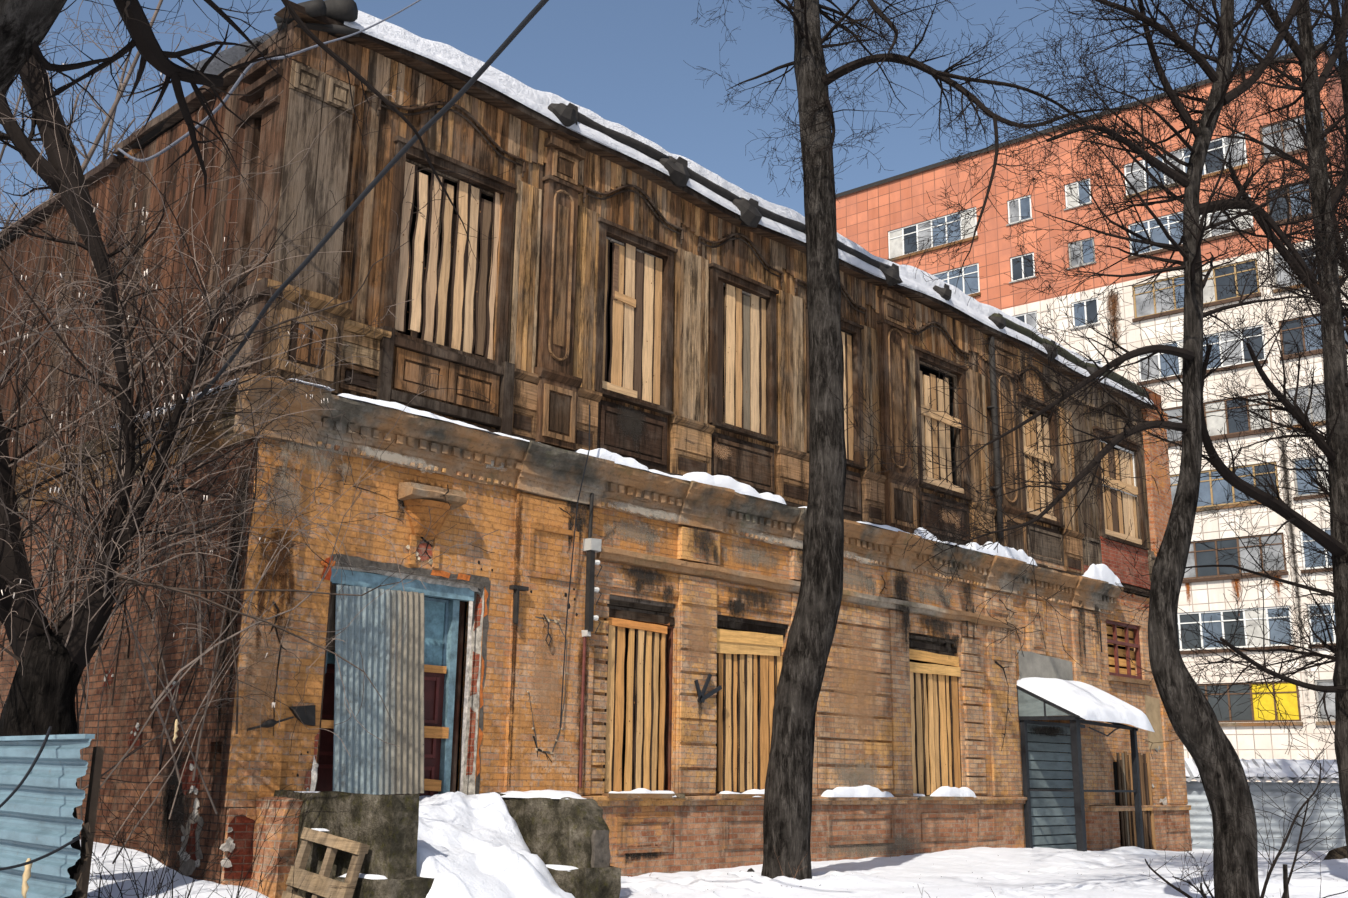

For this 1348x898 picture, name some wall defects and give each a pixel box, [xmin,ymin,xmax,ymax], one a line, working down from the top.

water stain [256,529,295,647]
water stain [623,568,673,602]
water stain [729,589,780,619]
water stain [203,449,252,882]
spalling [320,540,491,795]